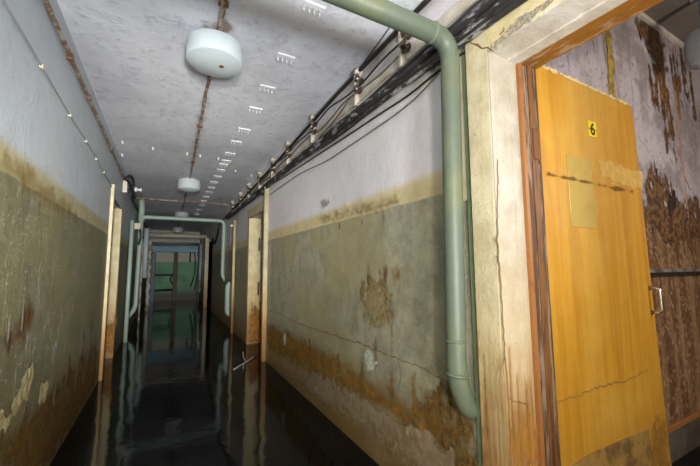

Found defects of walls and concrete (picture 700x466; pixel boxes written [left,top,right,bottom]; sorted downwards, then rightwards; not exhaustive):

peeling [492,0,553,50]
peeling [643,162,700,257]
crack [267,304,447,391]
peeling [361,268,392,329]
crack [497,160,531,466]
peeling [0,364,49,433]
leakage [419,382,478,466]